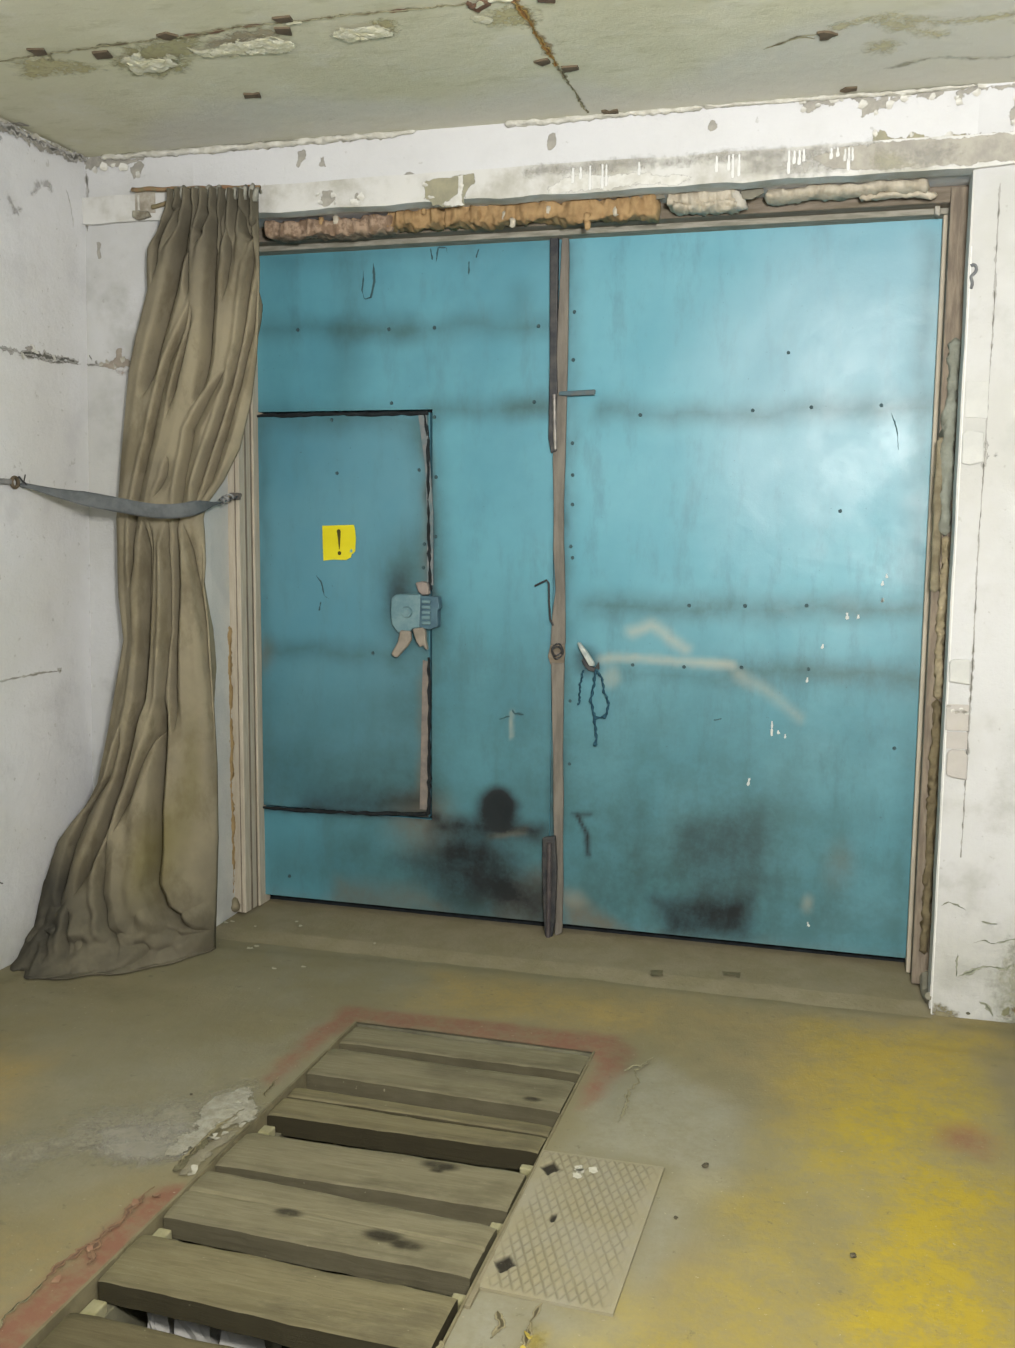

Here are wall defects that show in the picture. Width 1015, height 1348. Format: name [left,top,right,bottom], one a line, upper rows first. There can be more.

rust [492,0,589,113]
peeling [315,190,365,207]
peeling [404,172,475,207]
spalling [87,348,131,374]
water stain [932,1005,957,1017]
spalling [357,1022,592,1057]
spalling [172,1101,246,1176]
spalling [275,1132,520,1173]
spalling [172,1238,452,1297]